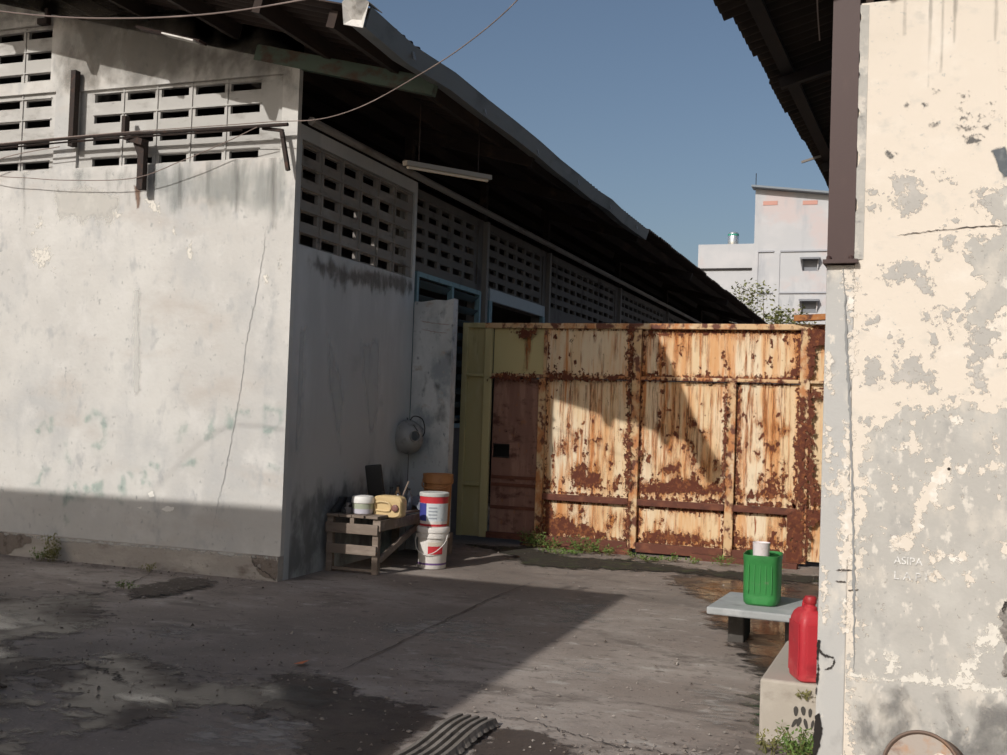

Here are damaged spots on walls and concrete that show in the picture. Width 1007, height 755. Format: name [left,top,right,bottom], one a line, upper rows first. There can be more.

peeling [866,169,928,218]
crack [213,235,265,529]
rust [487,324,825,564]
peeling [819,186,1007,755]
water stain [0,591,446,755]
spalling [813,713,823,755]